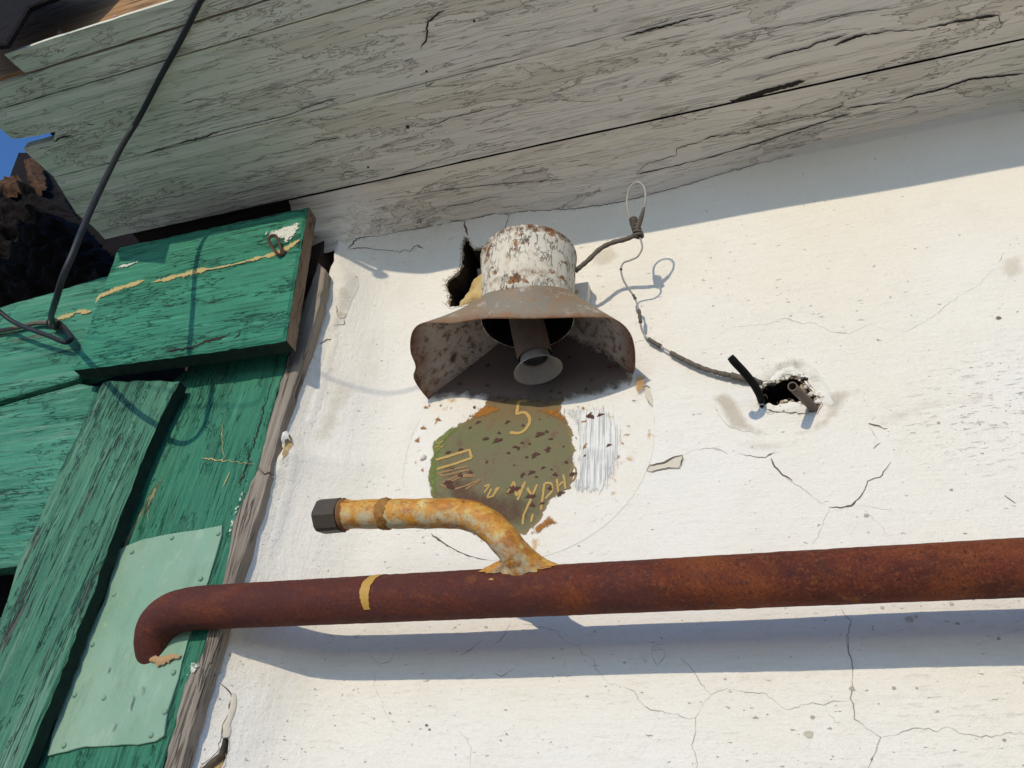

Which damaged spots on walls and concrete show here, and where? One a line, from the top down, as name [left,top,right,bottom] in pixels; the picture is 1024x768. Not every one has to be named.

crack [420,10,445,49]
crack [586,8,1011,102]
crack [344,74,1020,253]
spalling [441,237,484,308]
spalling [762,366,819,413]
peeling [647,455,683,472]
crack [716,449,806,491]
crack [813,462,891,543]
crack [789,612,857,723]
spalling [200,693,237,768]